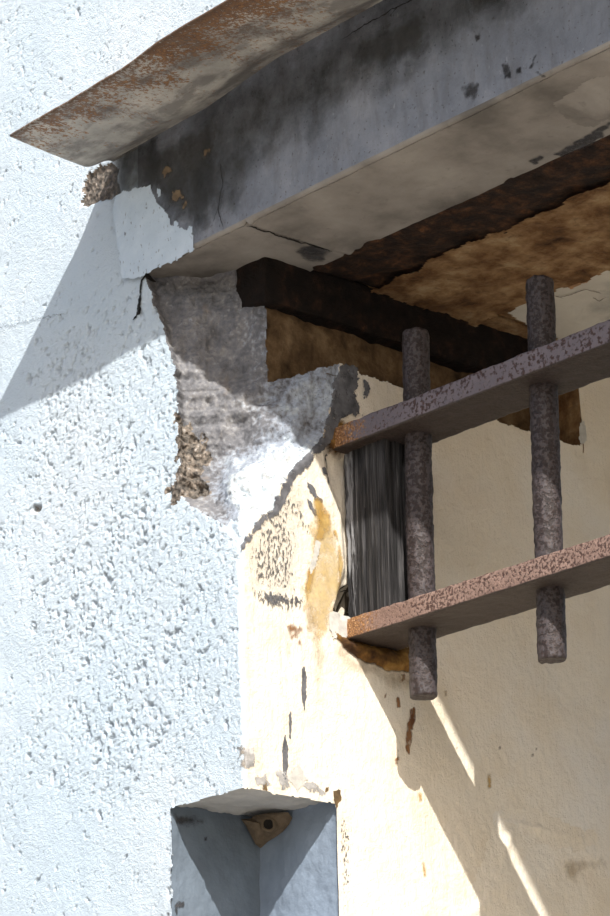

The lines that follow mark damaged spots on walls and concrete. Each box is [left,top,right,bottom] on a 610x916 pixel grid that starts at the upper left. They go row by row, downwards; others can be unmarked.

damp [502,56,536,78]
damp [116,0,507,214]
damp [297,245,327,261]
spalling [81,162,403,552]
spalling [430,362,474,390]
spalling [496,408,530,431]
spalling [558,388,587,453]
rust [305,499,409,681]
rust [395,697,416,764]
peeling [239,745,342,808]